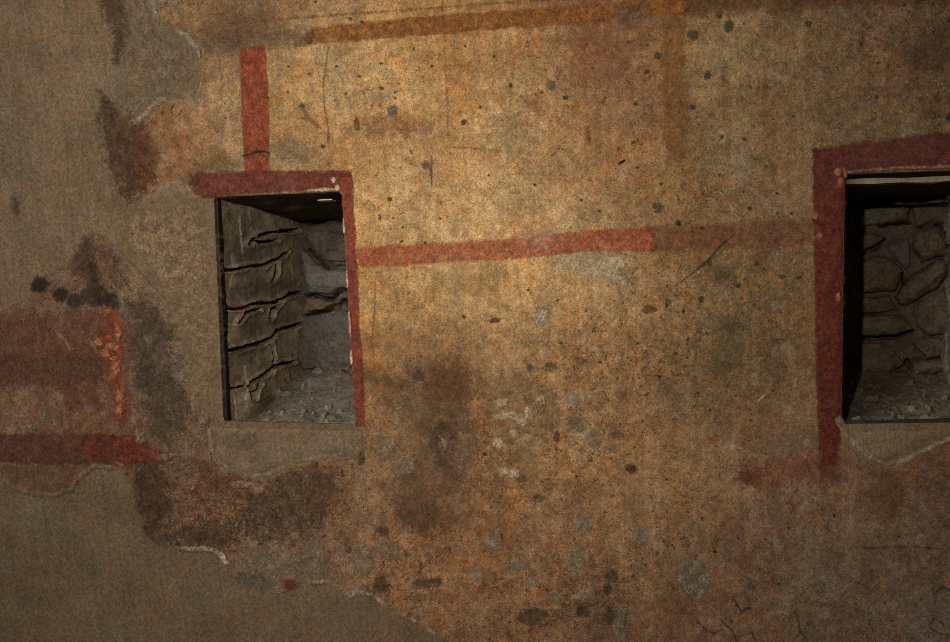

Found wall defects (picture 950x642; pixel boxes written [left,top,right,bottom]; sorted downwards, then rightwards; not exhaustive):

leakage [92,0,219,437]
flaking render [31,234,340,494]